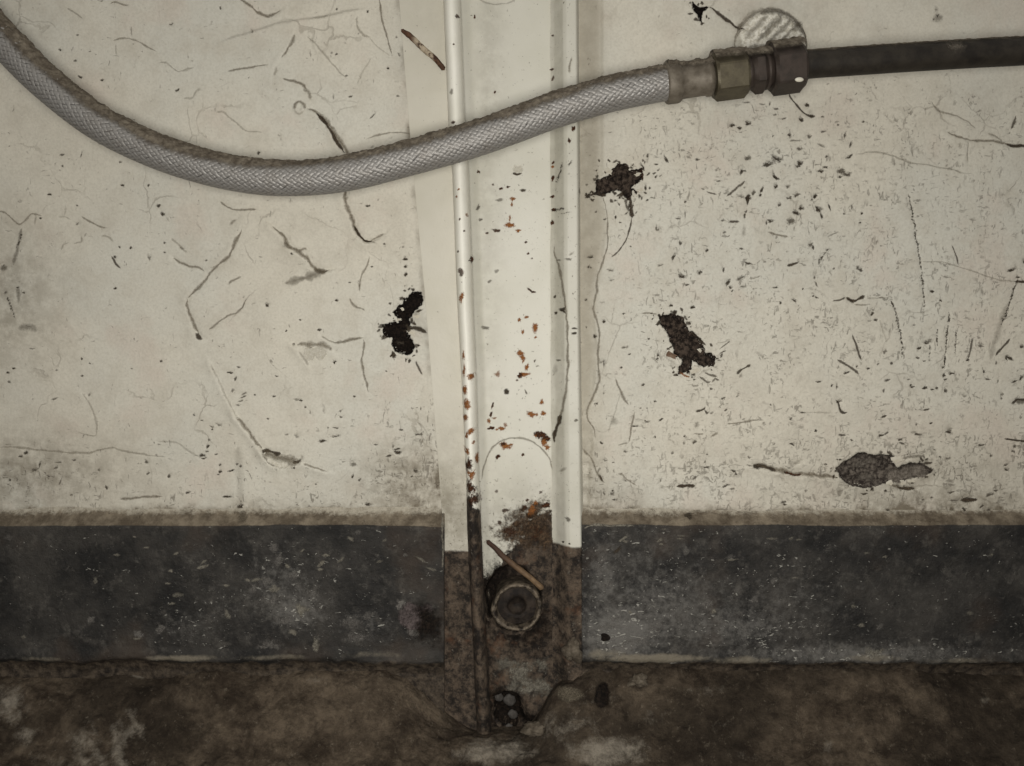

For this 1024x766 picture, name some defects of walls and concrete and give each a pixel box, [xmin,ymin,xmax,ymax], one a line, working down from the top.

crack [285,79,348,153]
crack [344,192,379,242]
flaking render [585,154,668,223]
crack [175,202,255,340]
crack [275,229,328,283]
flaking render [377,258,427,374]
rust [504,350,536,394]
flaking render [651,305,729,411]
rust [462,351,482,505]
rust [534,431,550,450]
flaking render [824,432,940,495]
rust [490,491,570,550]